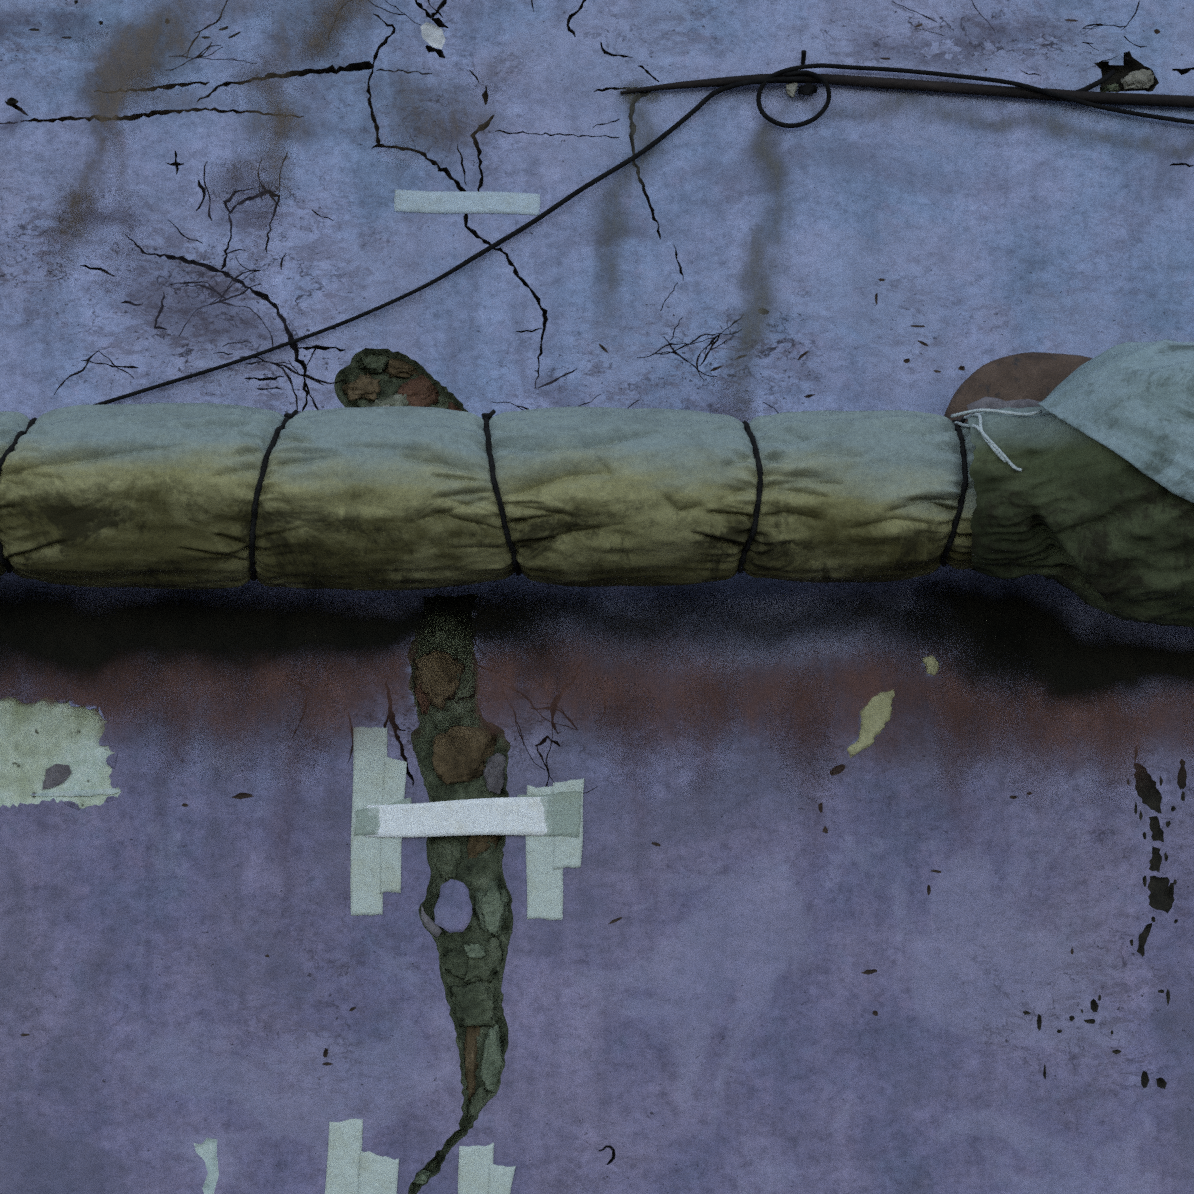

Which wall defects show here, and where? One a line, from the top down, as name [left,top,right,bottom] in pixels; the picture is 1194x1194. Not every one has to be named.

flaking render [1094,51,1159,92]
crack [0,0,744,411]
flaking render [334,348,468,412]
peeling [0,697,121,810]
flaking render [407,594,511,802]
peeling [829,690,895,776]
peeling [1127,748,1187,957]
flaking render [408,835,513,1194]
peeling [194,1138,219,1194]